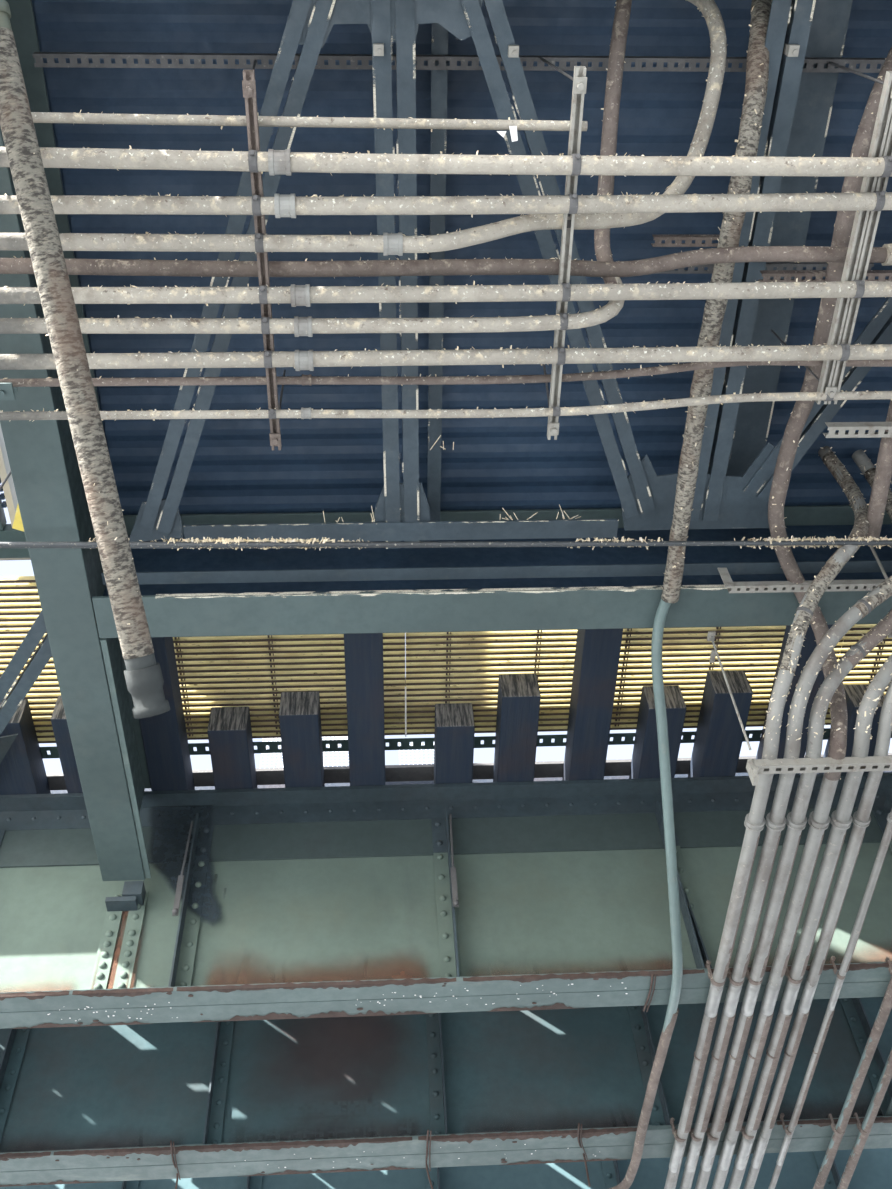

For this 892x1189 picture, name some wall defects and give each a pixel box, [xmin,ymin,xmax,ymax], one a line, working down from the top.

corrosion [208,961,426,985]
peeling [806,962,889,971]
peeling [0,969,714,1001]
peeling [487,1002,580,1012]
peeling [198,1008,437,1022]
peeling [13,1020,151,1029]
corrosion [289,1016,393,1102]
peeling [0,1127,637,1161]
peeling [237,1164,426,1177]